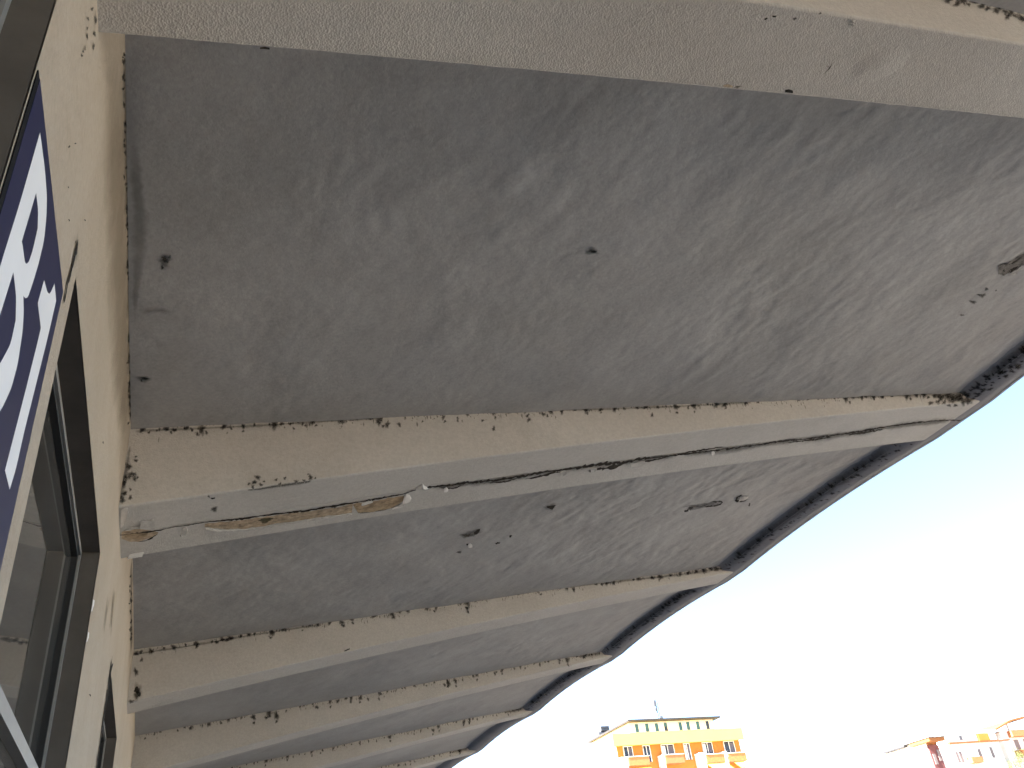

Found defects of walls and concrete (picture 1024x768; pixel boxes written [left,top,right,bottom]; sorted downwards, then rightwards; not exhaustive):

crack [120,419,961,536]
spalling [120,508,158,559]
spalling [205,494,411,532]
peeling [684,495,750,512]